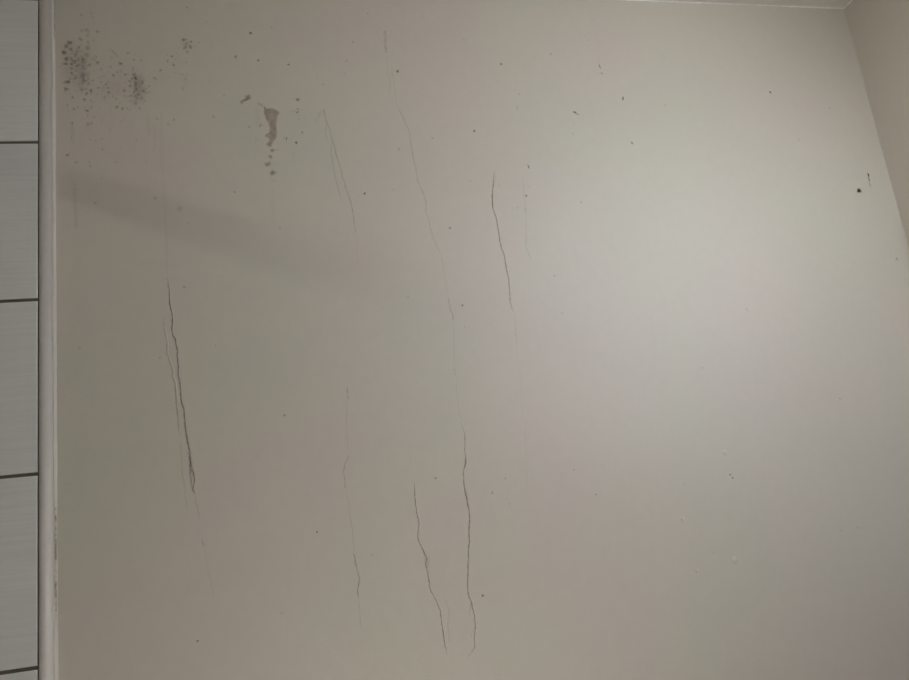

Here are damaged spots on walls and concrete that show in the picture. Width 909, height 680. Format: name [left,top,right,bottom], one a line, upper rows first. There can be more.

crack [493,171,515,313]
crack [415,421,477,660]